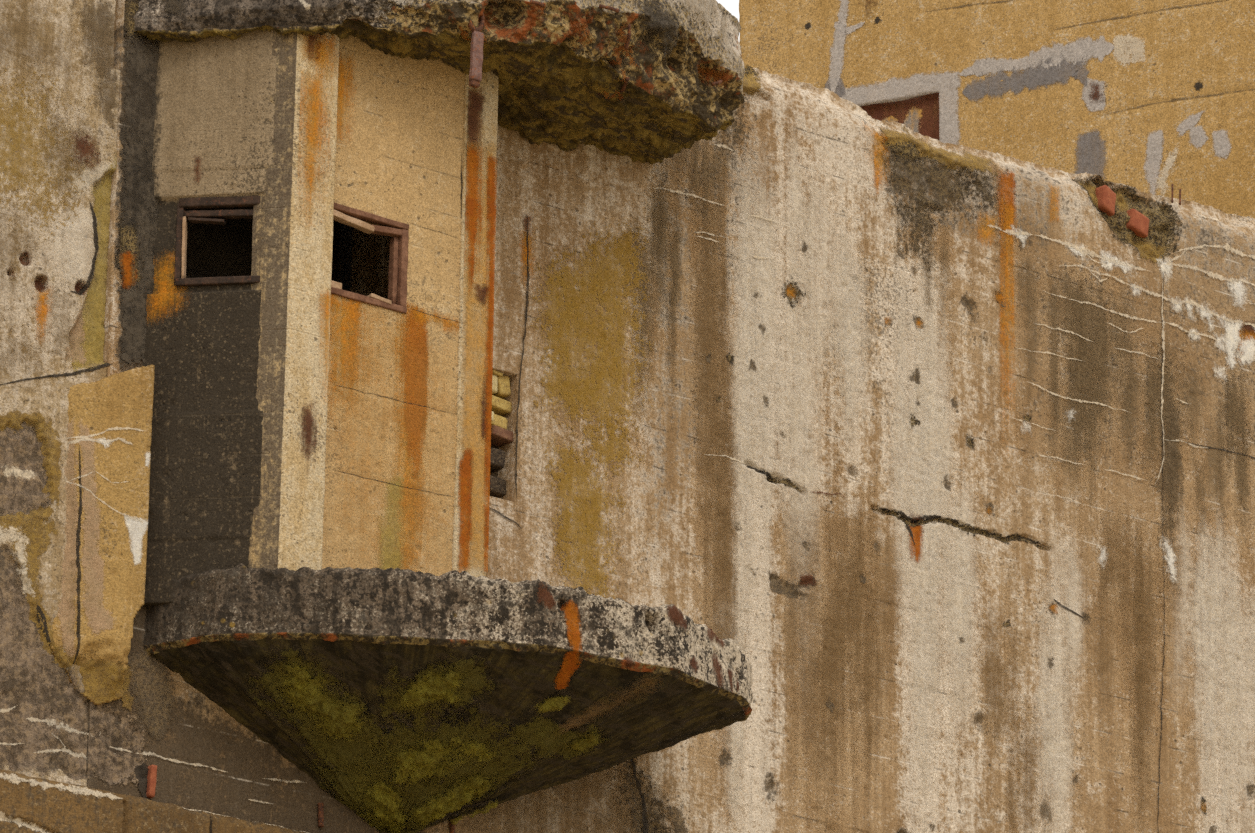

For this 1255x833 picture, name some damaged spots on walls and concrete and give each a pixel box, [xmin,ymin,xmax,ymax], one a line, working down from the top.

corrosion [299,33,353,203]
spalling [1072,174,1185,264]
corrosion [395,88,497,571]
corrosion [302,406,317,458]
water stain [700,150,865,662]
crack [704,454,1050,550]
water stain [819,308,975,794]
water stain [872,126,1255,832]
corrosion [539,588,581,690]
corrosion [667,605,687,631]
corrosion [690,627,739,692]
water stain [110,746,226,772]